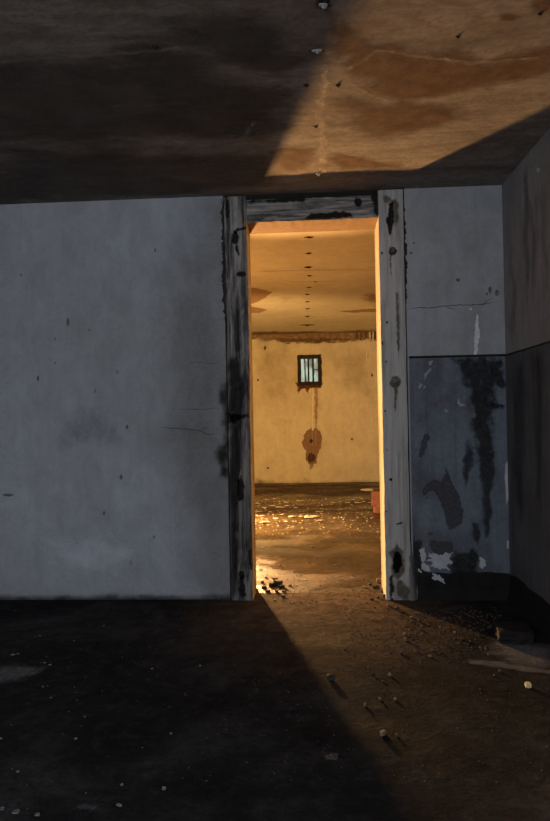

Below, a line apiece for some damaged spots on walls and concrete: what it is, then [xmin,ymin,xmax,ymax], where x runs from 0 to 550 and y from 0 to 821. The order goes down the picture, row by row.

crack [403,190,492,309]
corrosion [295,382,322,421]
damp [449,308,506,573]
peeling [423,469,463,529]
spalling [418,533,453,584]